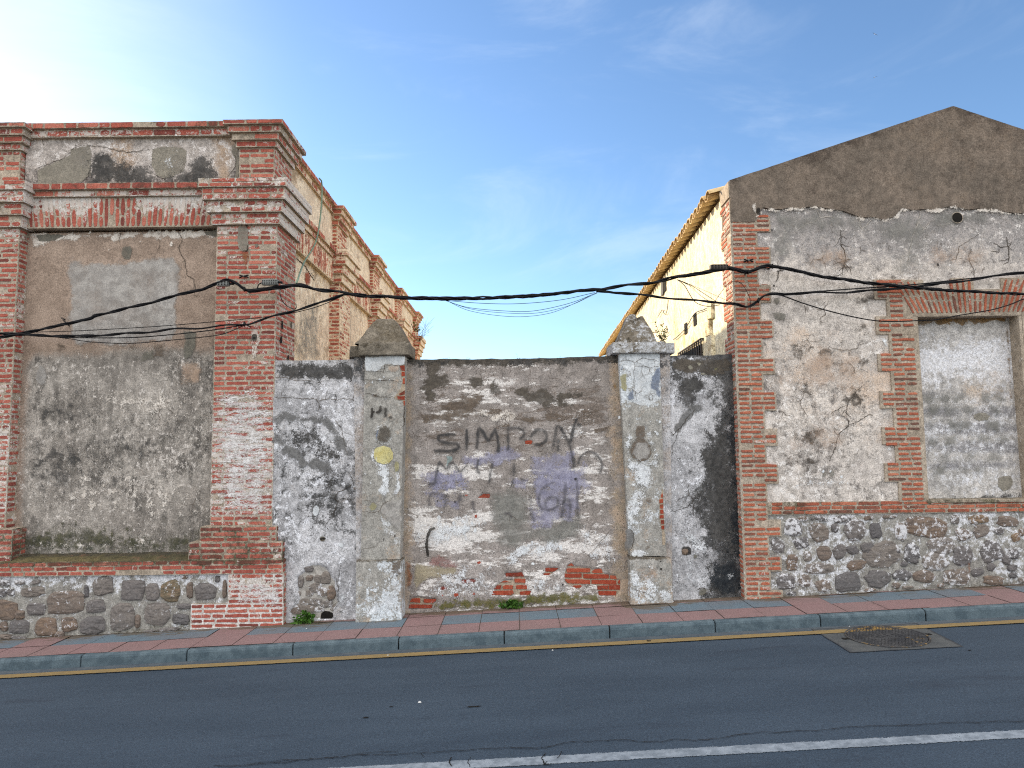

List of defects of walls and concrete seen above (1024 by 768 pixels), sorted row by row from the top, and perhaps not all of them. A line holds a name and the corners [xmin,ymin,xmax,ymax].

peeling [756,206,840,217]
crack [793,208,872,276]
peeling [857,205,1024,223]
mould [18,387,164,501]
peeling [55,387,279,523]
mould [284,422,349,530]
water stain [410,357,611,437]
mould [671,356,741,598]
crack [777,300,873,459]
mould [24,523,191,554]
spalling [363,500,707,620]